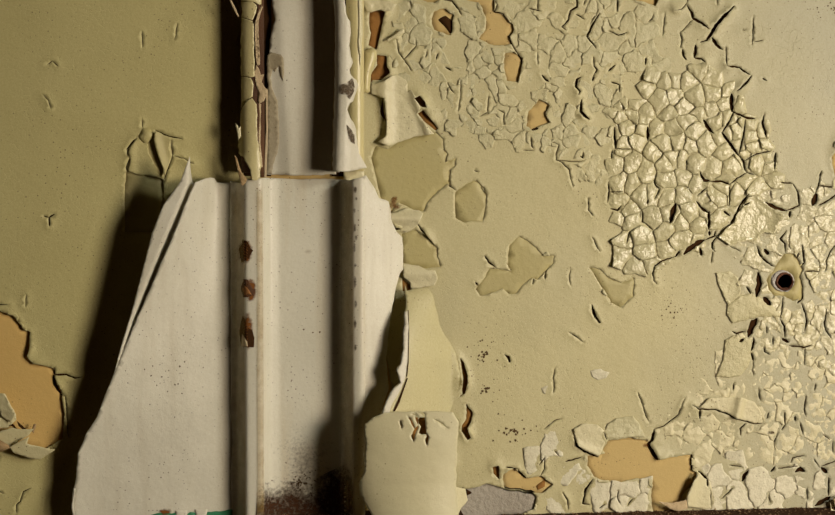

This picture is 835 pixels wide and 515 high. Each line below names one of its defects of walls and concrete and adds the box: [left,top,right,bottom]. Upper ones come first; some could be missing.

crack [575,75,620,120]
crack [126,122,191,179]
crack [553,142,585,186]
crack [588,184,622,216]
crack [626,181,676,243]
crack [648,0,835,361]
peeling [364,0,835,515]
peeling [71,128,256,515]
peeling [0,311,64,459]
crack [638,394,684,460]
corrosion [256,470,353,515]